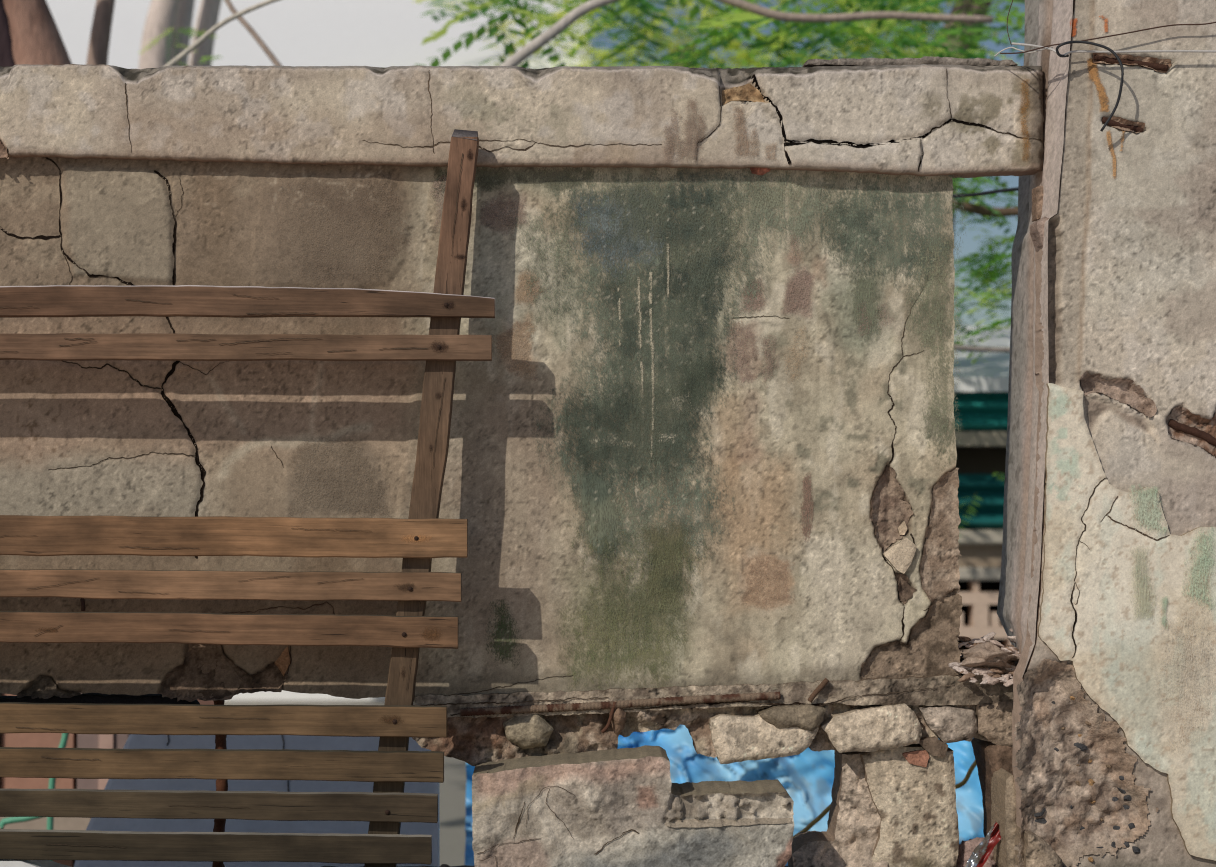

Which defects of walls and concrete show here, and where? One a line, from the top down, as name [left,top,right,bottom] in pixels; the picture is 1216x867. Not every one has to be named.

crack [751,69,1041,172]
corrosion [1087,59,1109,112]
crack [1,157,135,286]
crack [48,317,228,517]
leakage [591,272,676,457]
spalling [1080,371,1216,457]
leakage [572,467,621,570]
leakage [801,474,814,542]
flaking render [861,466,962,686]
crack [1070,478,1169,658]
flaking render [158,644,290,702]
spalling [1014,659,1159,867]